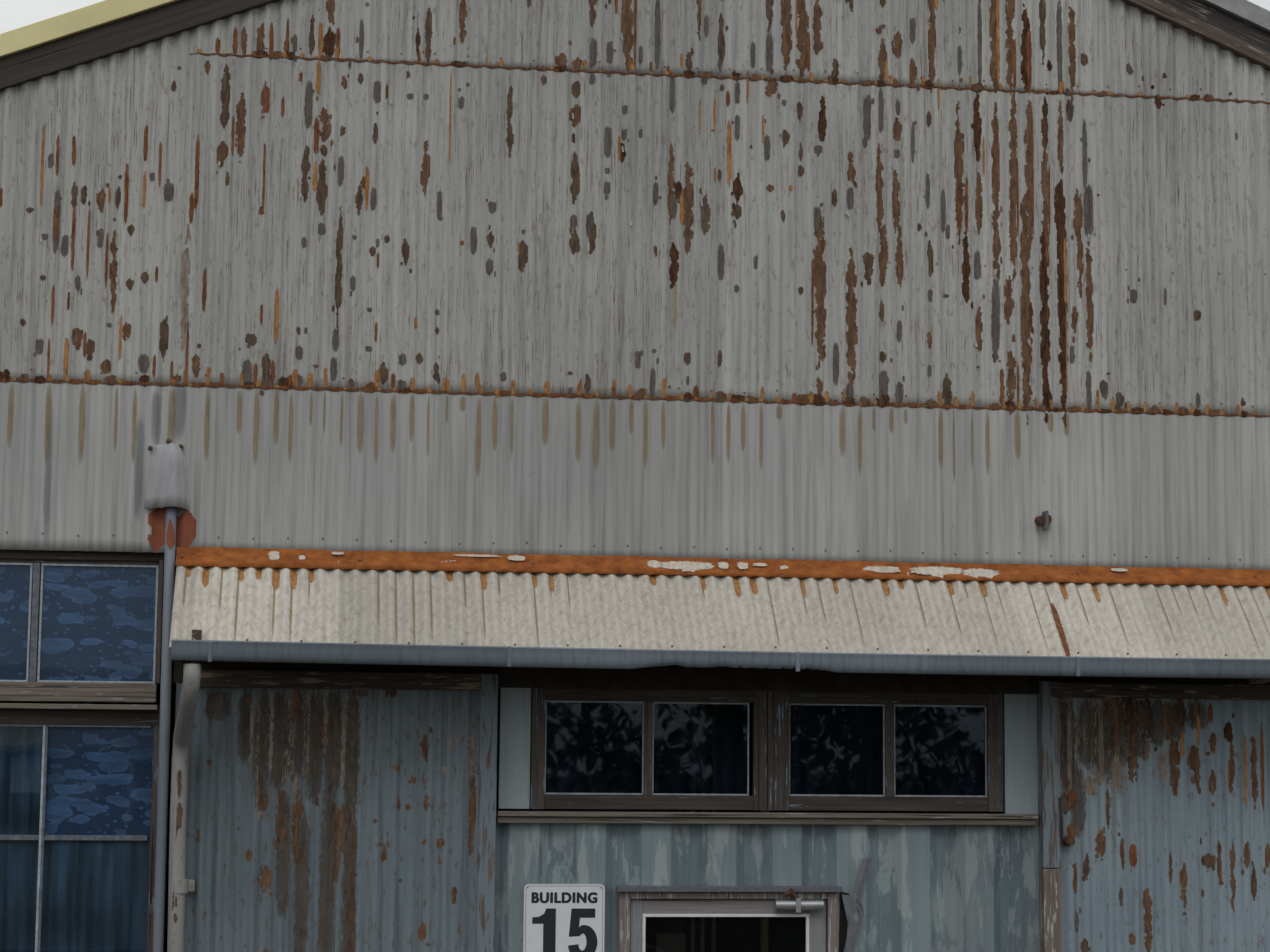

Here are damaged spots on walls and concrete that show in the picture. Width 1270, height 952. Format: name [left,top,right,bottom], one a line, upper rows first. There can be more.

corrosion [197,0,1270,185]
corrosion [40,126,91,277]
corrosion [108,125,162,223]
corrosion [189,135,200,224]
corrosion [361,167,369,211]
corrosion [957,177,969,233]
corrosion [1016,110,1051,262]
corrosion [0,238,1270,475]
corrosion [1228,723,1265,809]
corrosion [1129,844,1137,867]